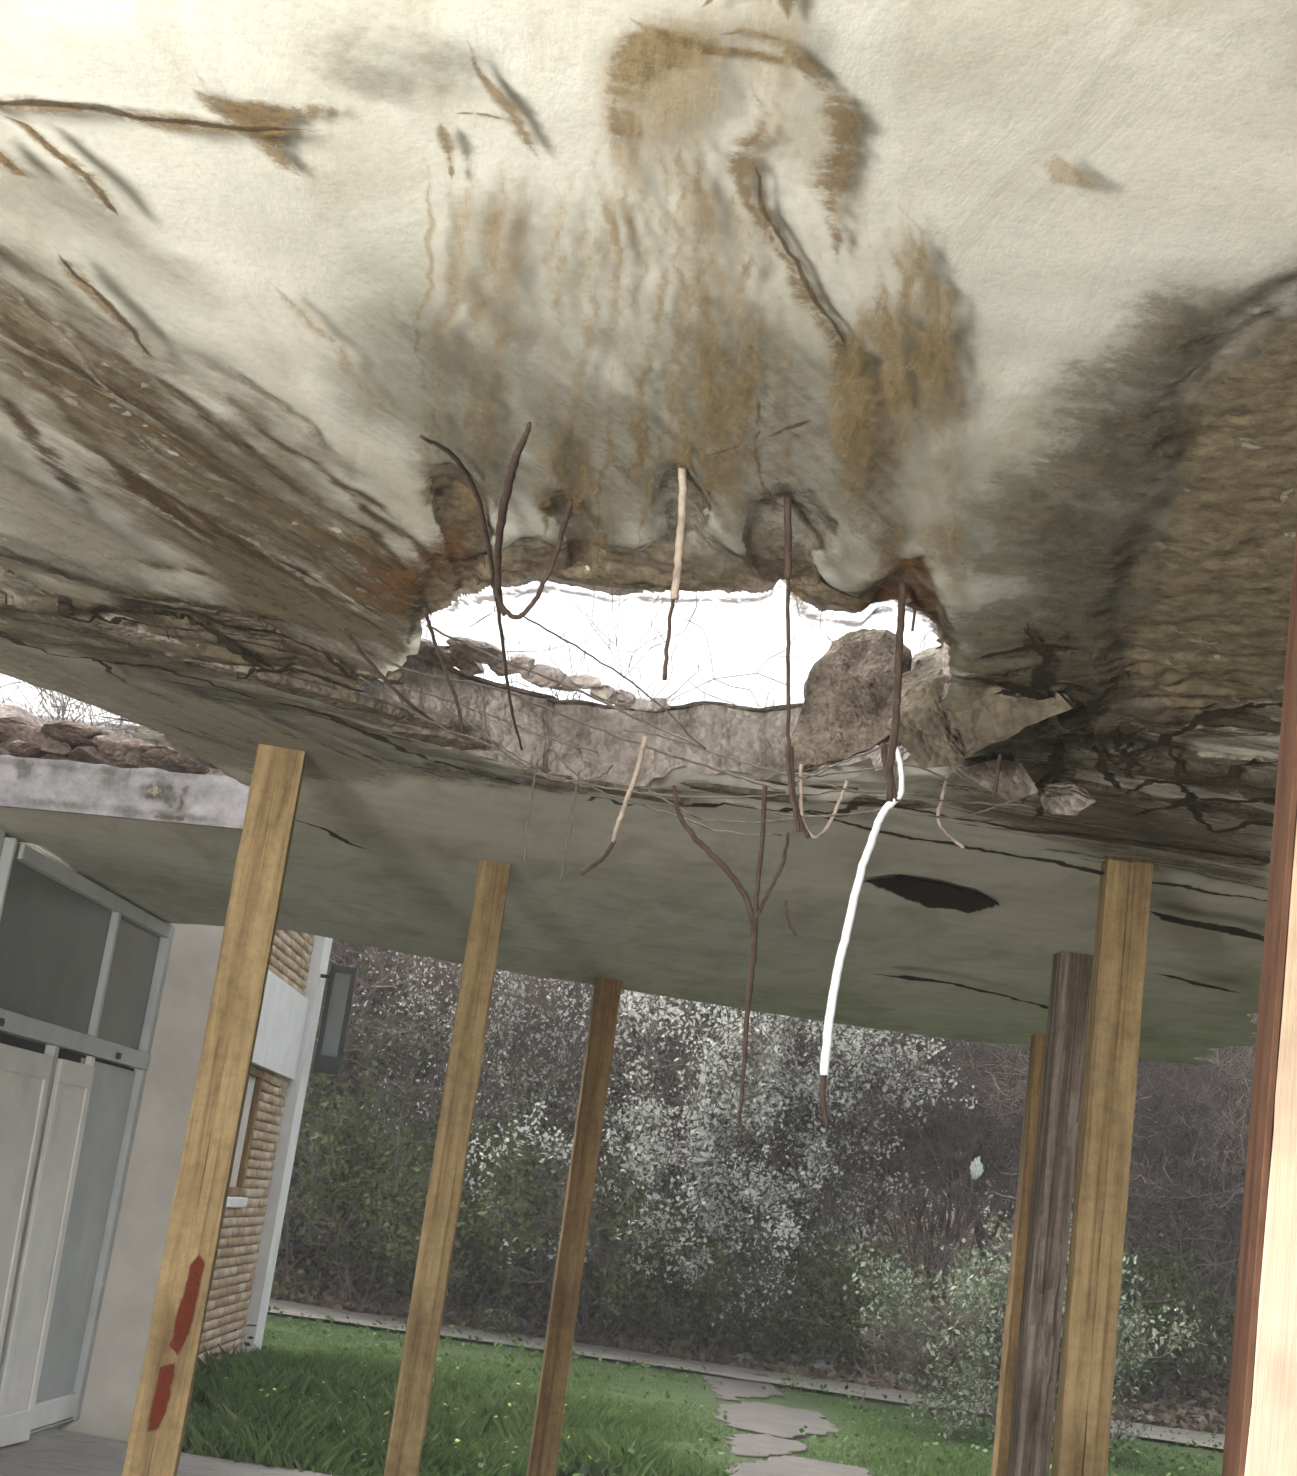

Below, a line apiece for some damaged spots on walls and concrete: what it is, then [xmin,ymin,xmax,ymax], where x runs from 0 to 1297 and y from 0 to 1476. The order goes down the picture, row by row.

crack [59,256,154,358]
crack [0,96,304,215]
water stain [0,253,432,709]
water stain [0,647,598,794]
corrosion [437,124,454,177]
corrosion [457,48,535,151]
spalling [58,422,965,1128]
corrosion [445,101,958,642]
spalling [864,875,1000,913]
crack [587,622,1283,942]
water stain [932,284,1277,795]
spalling [1017,302,1297,822]